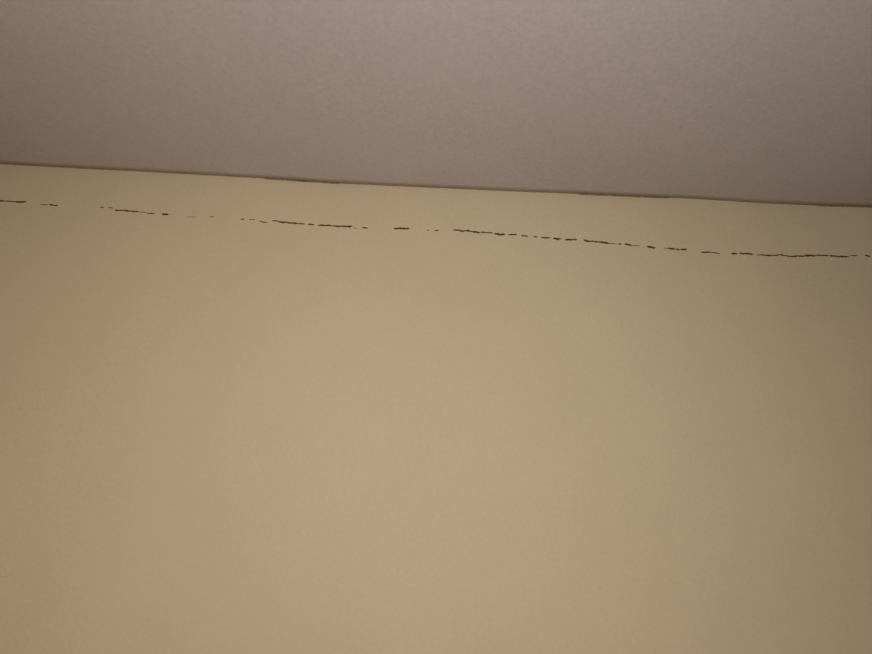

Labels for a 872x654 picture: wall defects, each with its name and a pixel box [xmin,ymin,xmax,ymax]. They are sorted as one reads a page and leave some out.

crack [101,207,169,216]
crack [241,219,367,229]
crack [394,227,870,261]